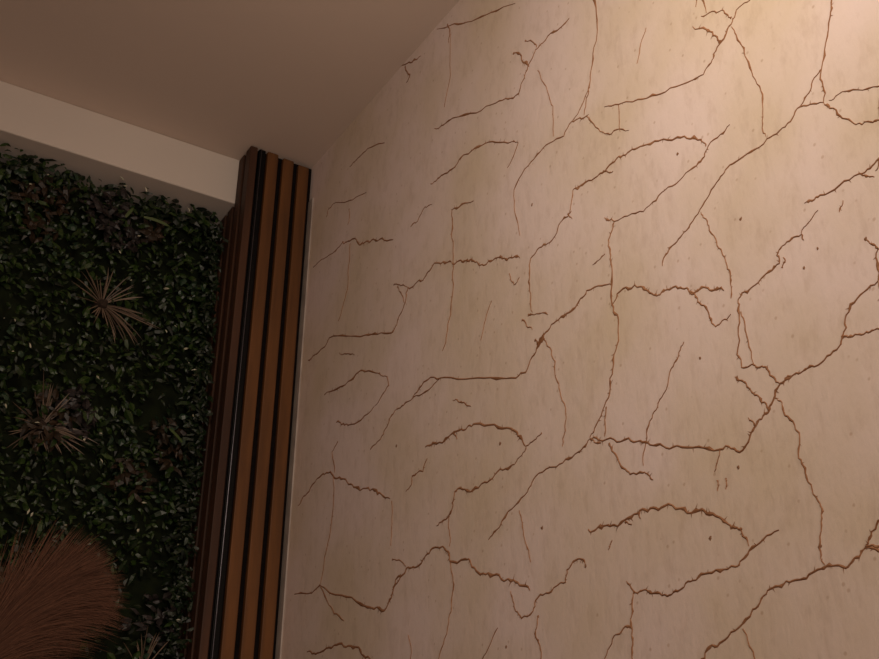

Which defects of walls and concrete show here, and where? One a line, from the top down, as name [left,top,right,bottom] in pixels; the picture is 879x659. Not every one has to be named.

crack [294,0,879,659]